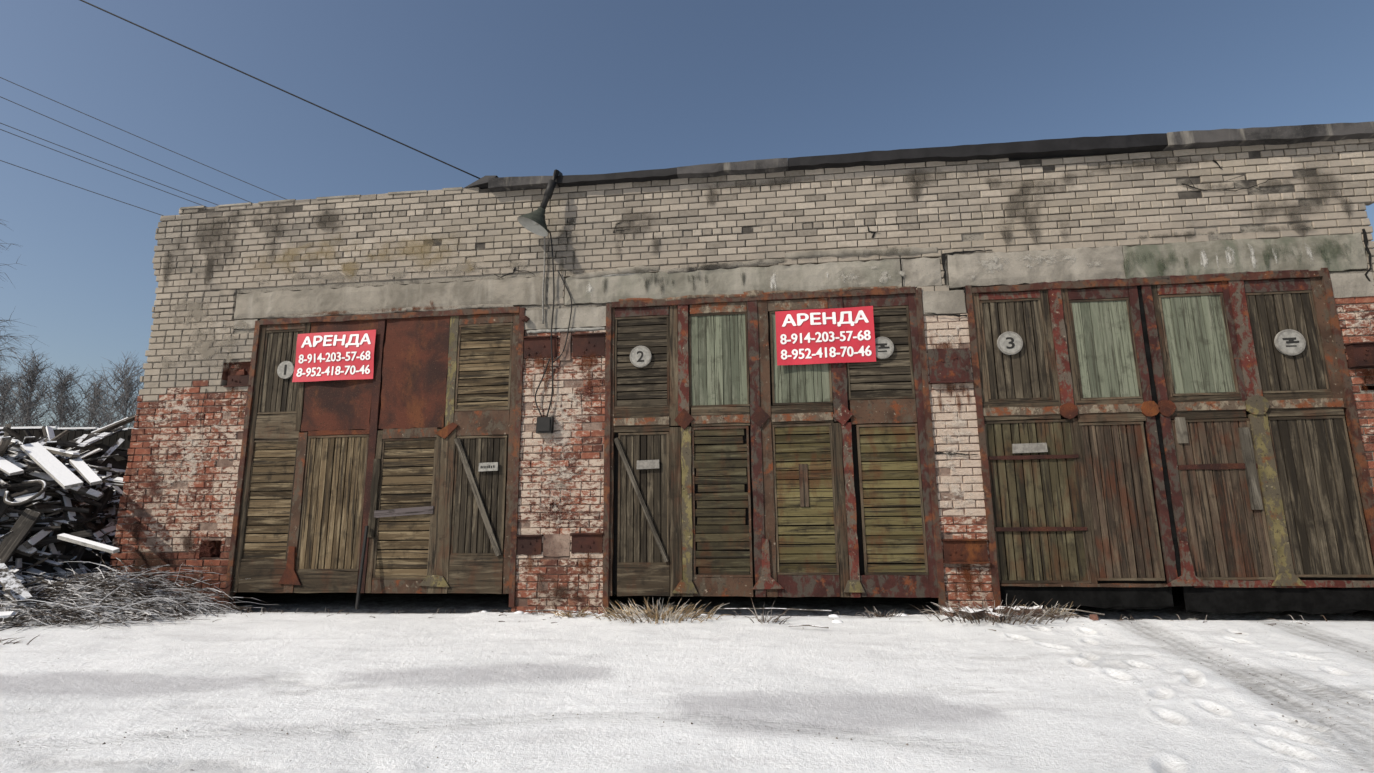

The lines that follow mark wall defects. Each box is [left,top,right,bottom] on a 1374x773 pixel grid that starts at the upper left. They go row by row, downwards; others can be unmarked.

leakage [199,228,228,282]
leakage [272,211,355,274]
crack [1362,229,1372,281]
peeling [149,397,197,421]
spalling [137,411,226,507]
peeling [520,375,605,531]
spalling [189,536,222,559]